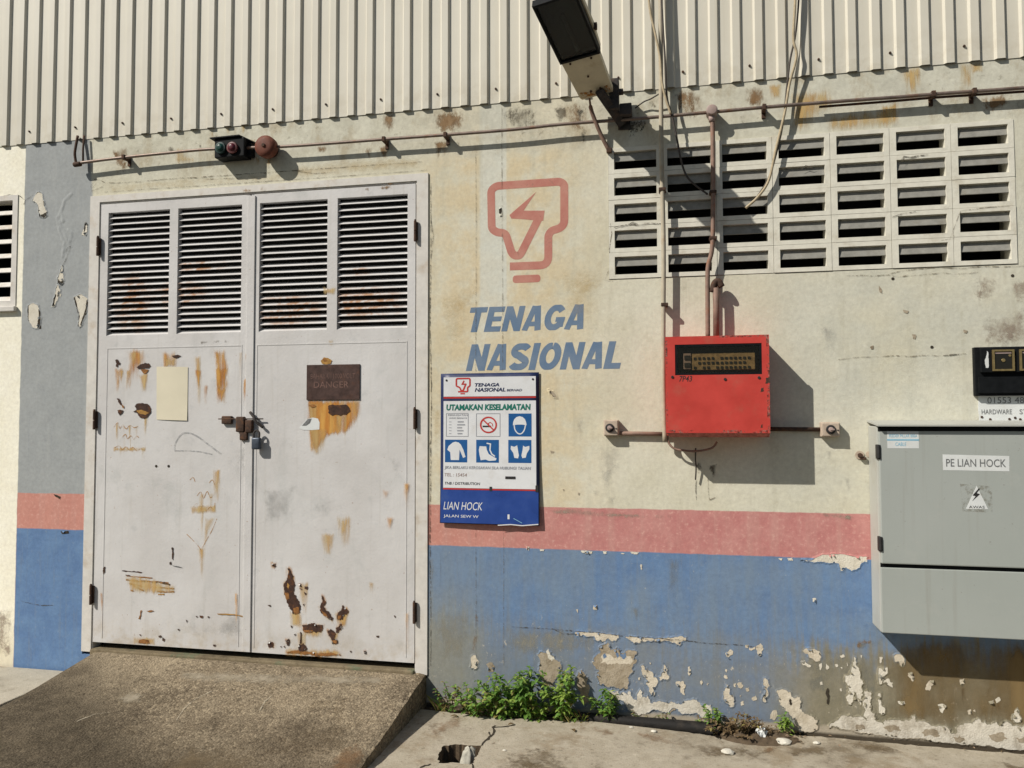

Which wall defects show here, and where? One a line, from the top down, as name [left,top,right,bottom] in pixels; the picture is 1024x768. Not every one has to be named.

peeling [31,191,48,219]
peeling [26,265,88,330]
rust [115,351,150,389]
rust [196,354,226,400]
rust [117,398,151,420]
rust [308,401,358,452]
peeling [778,552,869,573]
rust [268,563,351,657]
peeling [536,648,563,688]
peeling [571,629,1024,752]
water stain [901,645,964,718]
water stain [979,648,1024,722]